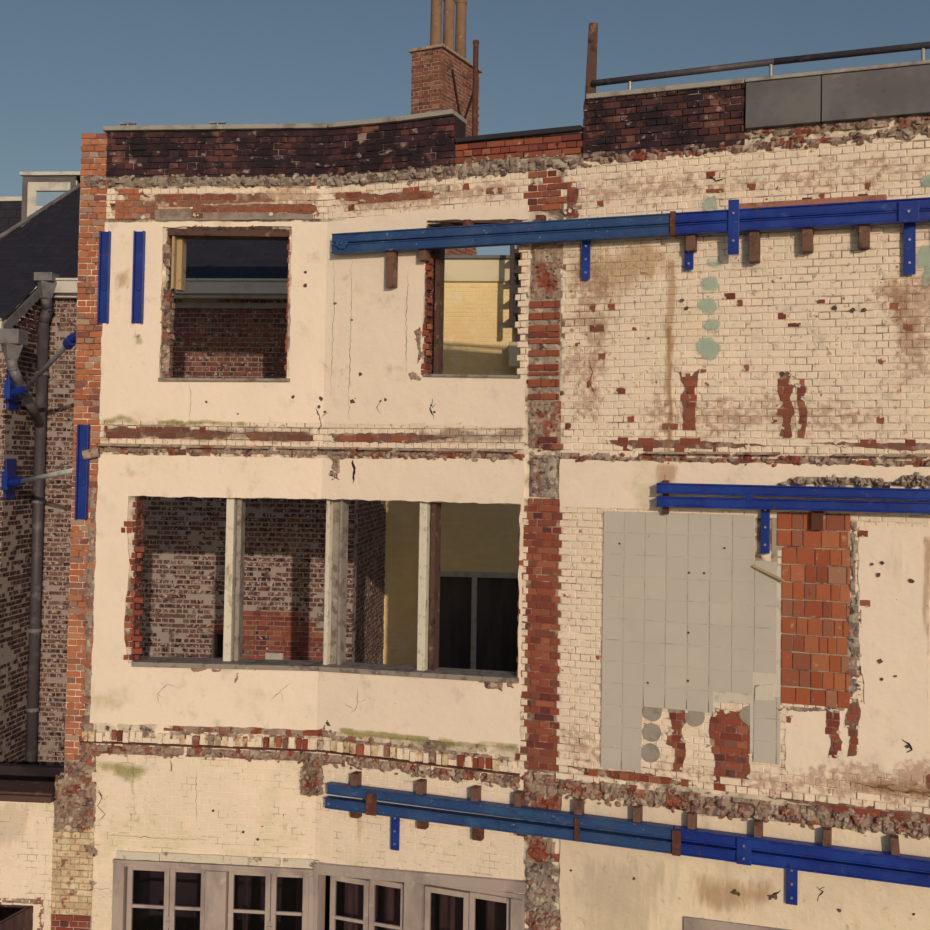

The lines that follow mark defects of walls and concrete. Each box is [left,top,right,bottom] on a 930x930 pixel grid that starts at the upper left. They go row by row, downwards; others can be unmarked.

flaking render [334,187,443,211]
flaking render [563,182,582,219]
crack [330,265,352,413]
flaking render [605,366,769,452]
flaking render [771,371,930,451]
spalling [54,485,98,833]
flaking render [708,708,753,791]
flaking render [825,698,861,759]
spalling [84,841,98,859]